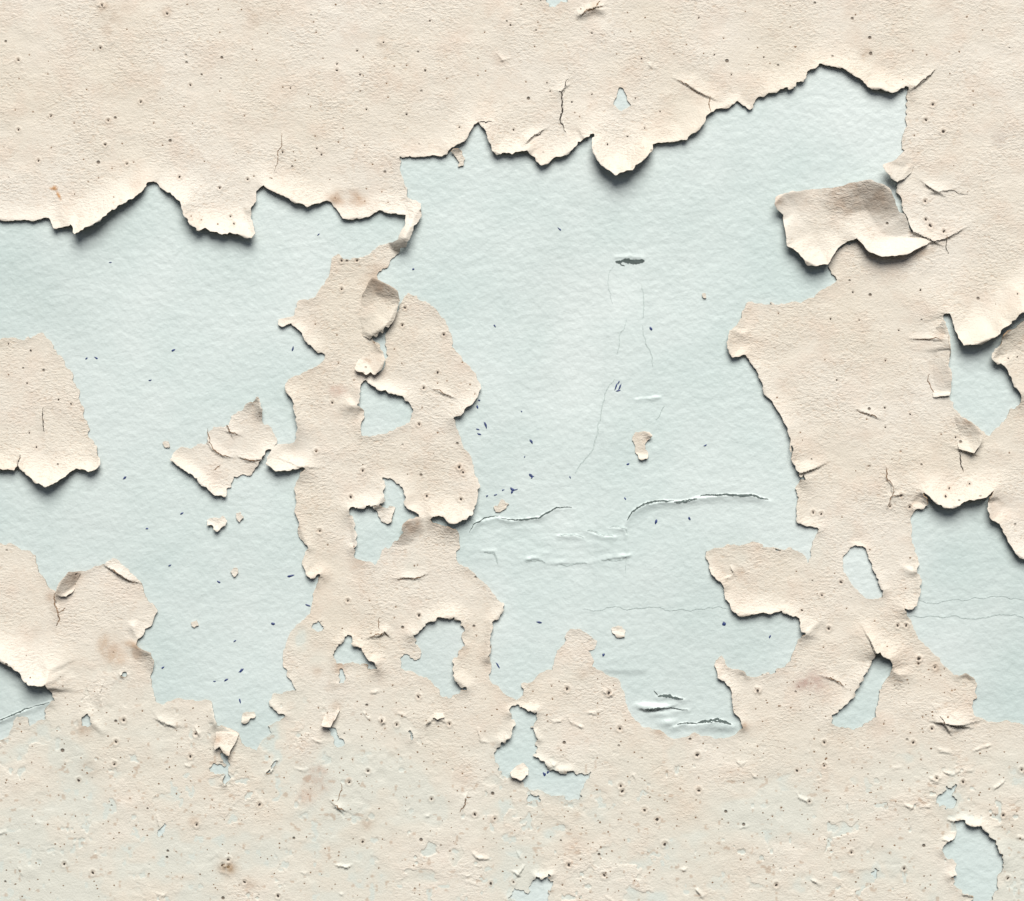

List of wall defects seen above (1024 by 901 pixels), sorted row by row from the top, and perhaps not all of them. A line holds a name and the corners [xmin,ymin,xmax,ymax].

peeling [923,270,1024,453]
peeling [0,50,930,802]
crack [469,507,572,532]
crack [526,493,767,572]
peeling [896,472,1024,725]
crack [645,691,731,725]
peeling [936,784,1011,901]